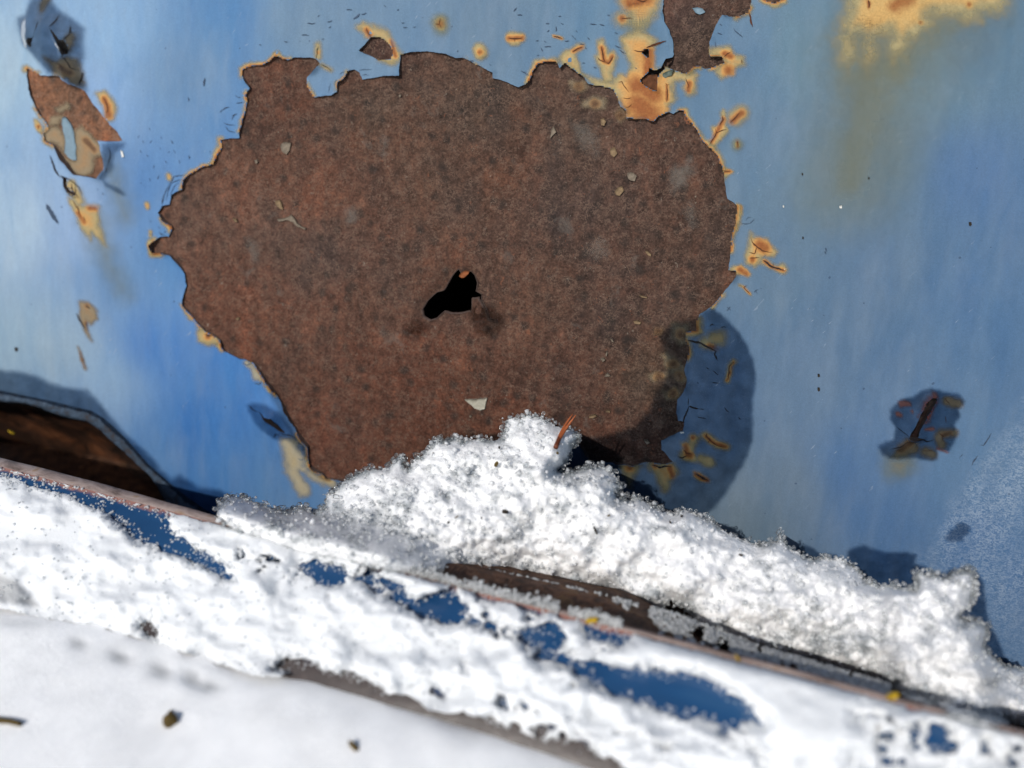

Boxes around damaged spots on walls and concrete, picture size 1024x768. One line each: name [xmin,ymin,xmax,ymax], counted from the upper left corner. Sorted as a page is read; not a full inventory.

corrosion [473,44,487,60]
corrosion [552,0,698,121]
corrosion [709,46,744,78]
corrosion [841,0,1004,62]
corrosion [96,91,116,121]
corrosion [709,106,748,149]
corrosion [67,180,104,243]
peeling [148,22,741,481]
corrosion [730,234,787,295]
corrosion [197,330,219,346]
corrosion [281,438,336,497]
corrosion [620,432,729,492]